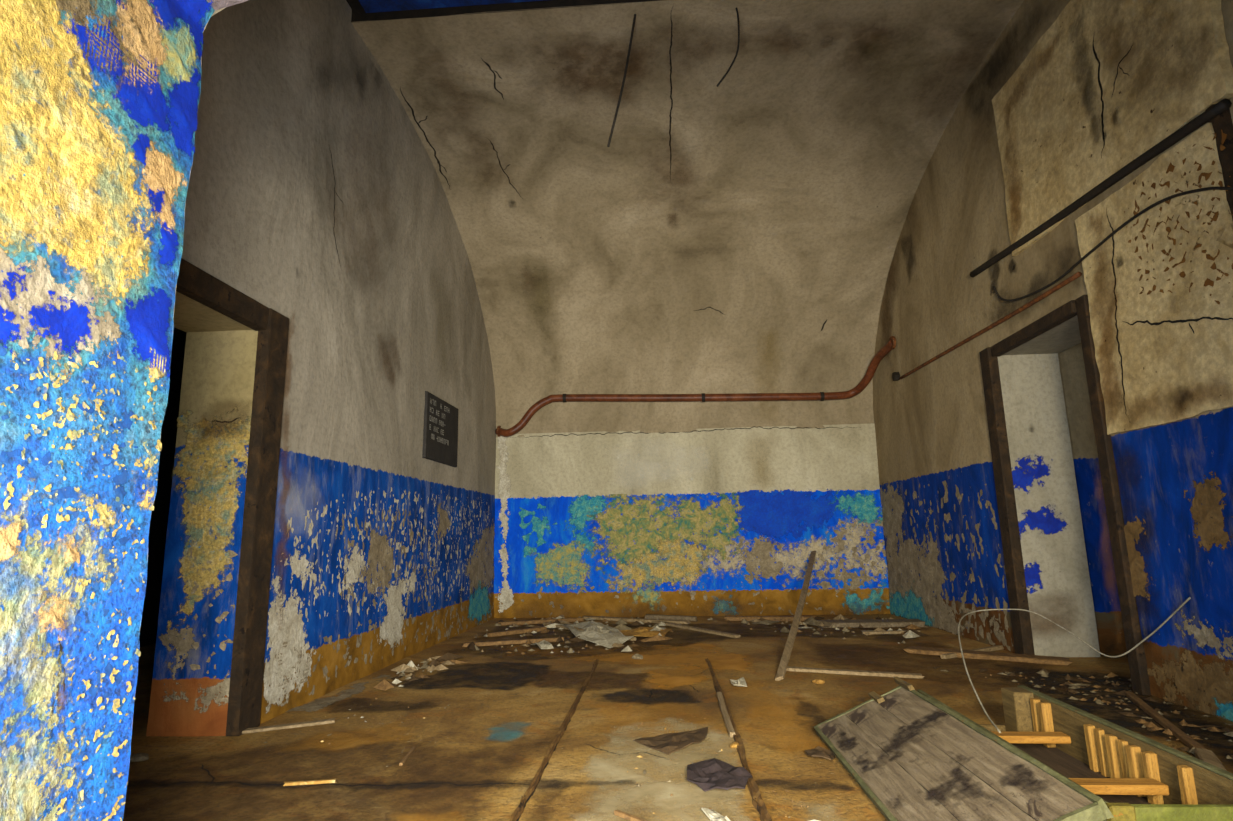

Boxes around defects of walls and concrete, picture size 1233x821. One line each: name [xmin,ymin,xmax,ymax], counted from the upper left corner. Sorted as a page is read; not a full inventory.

crack [667,7,675,182]
peeling [0,0,212,821]
peeling [158,408,251,713]
peeling [263,436,1013,717]
peeling [1012,455,1051,494]
peeling [1024,562,1043,594]
peeling [1018,504,1068,539]
peeling [1124,516,1152,601]
peeling [1184,471,1233,553]